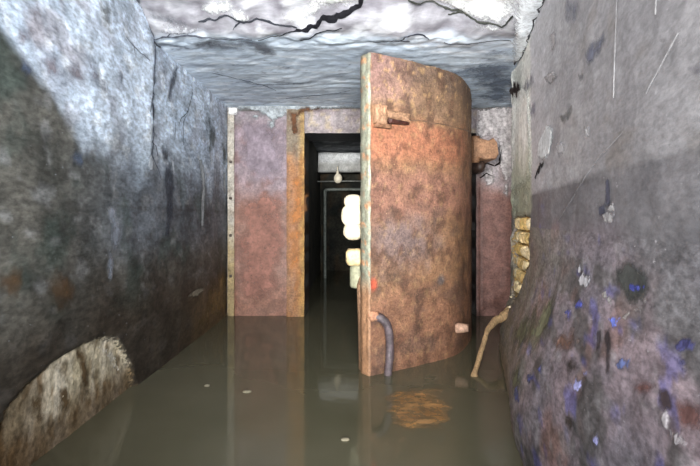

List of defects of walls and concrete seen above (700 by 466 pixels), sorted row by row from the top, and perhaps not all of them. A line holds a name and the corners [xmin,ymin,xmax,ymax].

crack [126,0,364,178]
corrosion [291,107,310,134]
crack [375,0,545,99]
peeling [441,0,543,63]